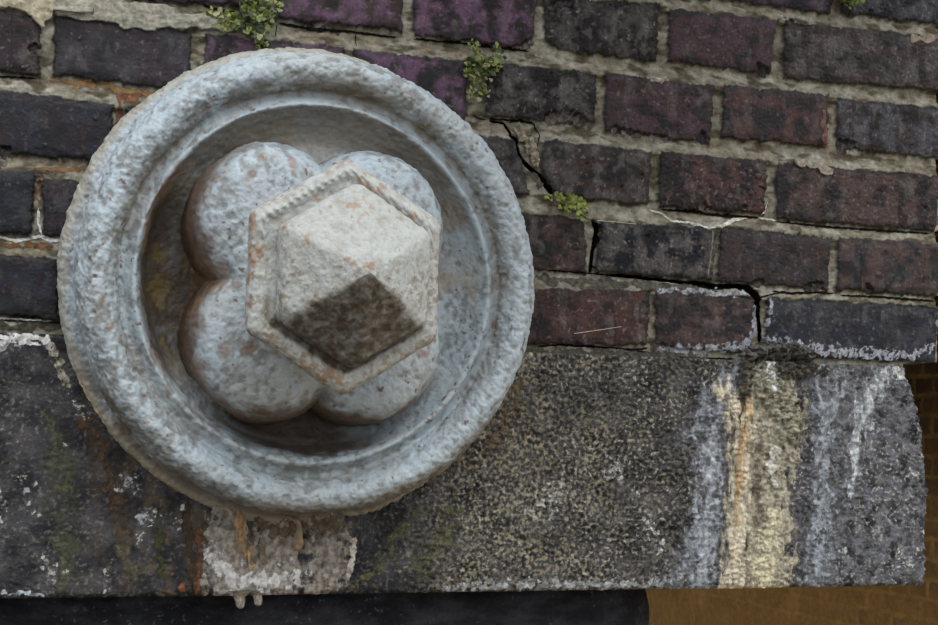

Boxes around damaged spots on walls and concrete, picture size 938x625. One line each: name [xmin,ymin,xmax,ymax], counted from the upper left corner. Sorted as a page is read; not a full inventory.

water stain [536,272,746,298]
crack [547,221,784,343]
water stain [0,319,83,390]
water stain [442,296,936,593]